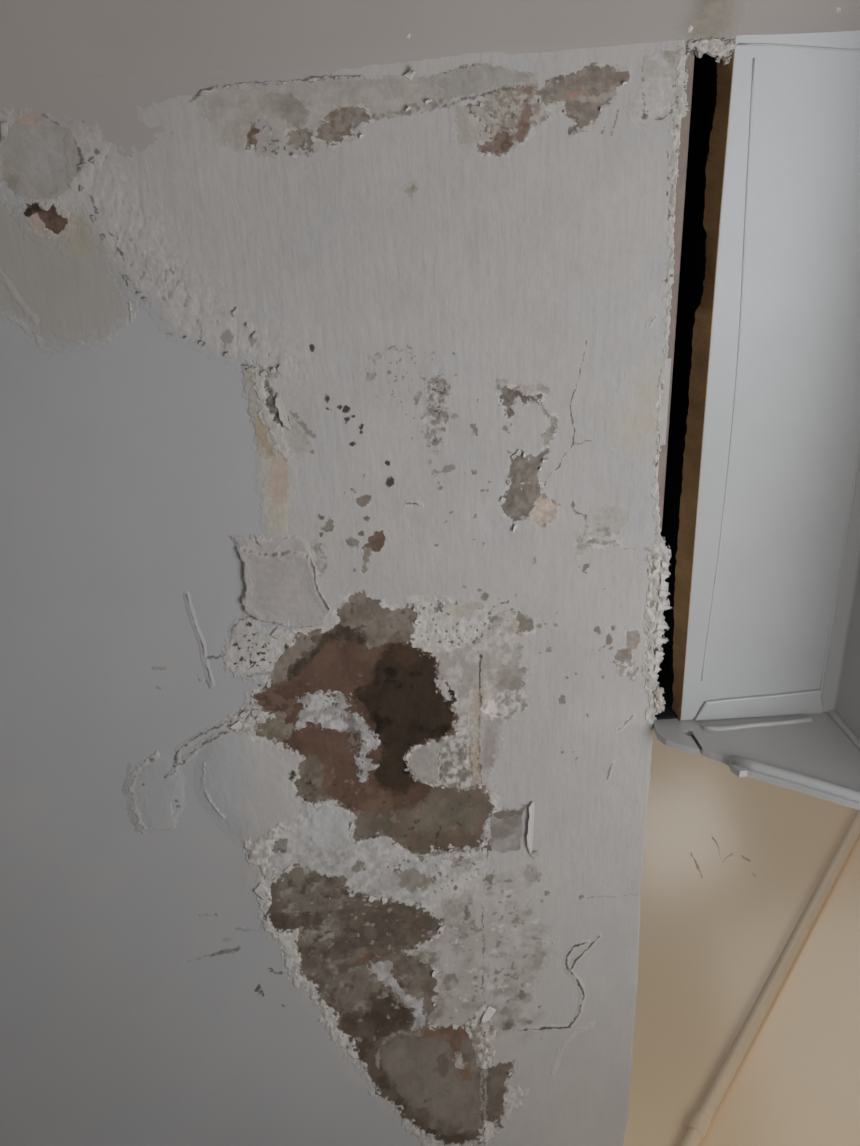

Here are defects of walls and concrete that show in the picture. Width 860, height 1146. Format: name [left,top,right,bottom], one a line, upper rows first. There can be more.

flaking render [10,189,82,250]
peeling [188,42,689,727]
crack [544,340,592,486]
flaking render [208,473,562,1146]
crack [468,654,489,994]
crack [517,931,602,1034]
crack [478,1027,490,1146]